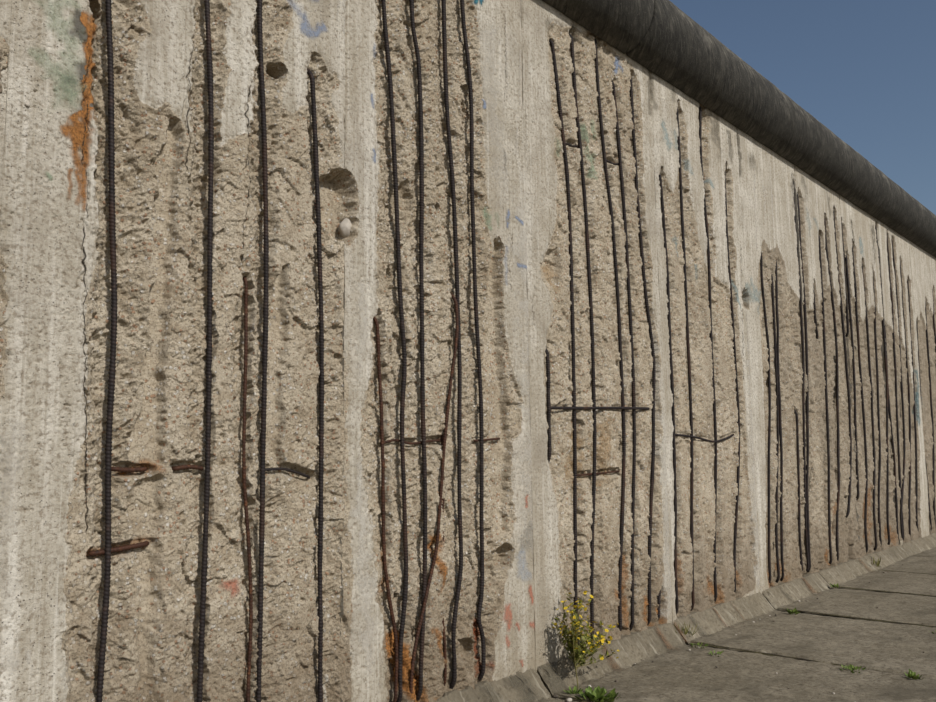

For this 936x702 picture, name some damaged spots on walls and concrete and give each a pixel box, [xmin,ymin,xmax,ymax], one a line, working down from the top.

spalling [0,36,9,93]
corrosion [62,12,97,209]
spalling [62,261,99,702]
spalling [117,102,195,702]
spalling [204,131,260,702]
spalling [273,106,359,702]
spalling [373,0,415,436]
corrosion [385,630,424,702]
spalling [416,0,452,702]
spalling [450,0,465,183]
spalling [540,21,665,649]
spalling [663,172,936,616]